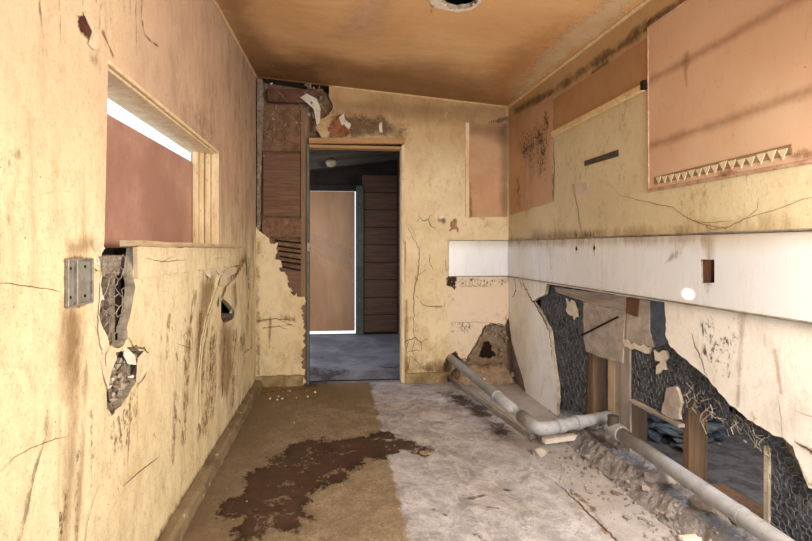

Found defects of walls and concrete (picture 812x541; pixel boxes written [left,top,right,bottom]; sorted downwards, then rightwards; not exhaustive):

flaking render [439,0,812,233]
flaking render [257,78,385,297]
crack [613,187,811,230]
spalling [90,238,152,418]
damp [174,294,216,445]
crack [404,215,446,368]
crack [446,319,507,363]
spalling [443,318,525,389]
peeling [566,298,579,320]
crack [0,411,68,537]
damp [215,430,435,541]
crack [555,482,618,541]